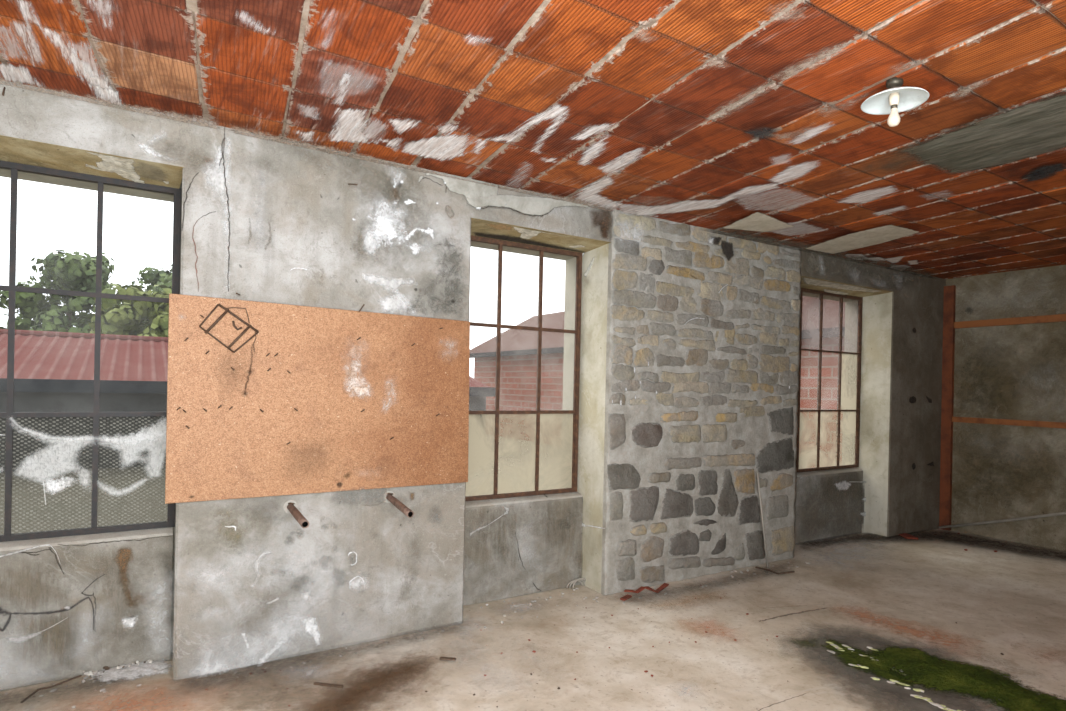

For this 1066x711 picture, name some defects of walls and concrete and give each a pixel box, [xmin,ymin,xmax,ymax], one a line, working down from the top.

peeling [86,152,145,184]
damp [1022,163,1066,182]
crack [182,128,254,292]
corrosion [117,549,134,606]
damp [795,628,1004,711]